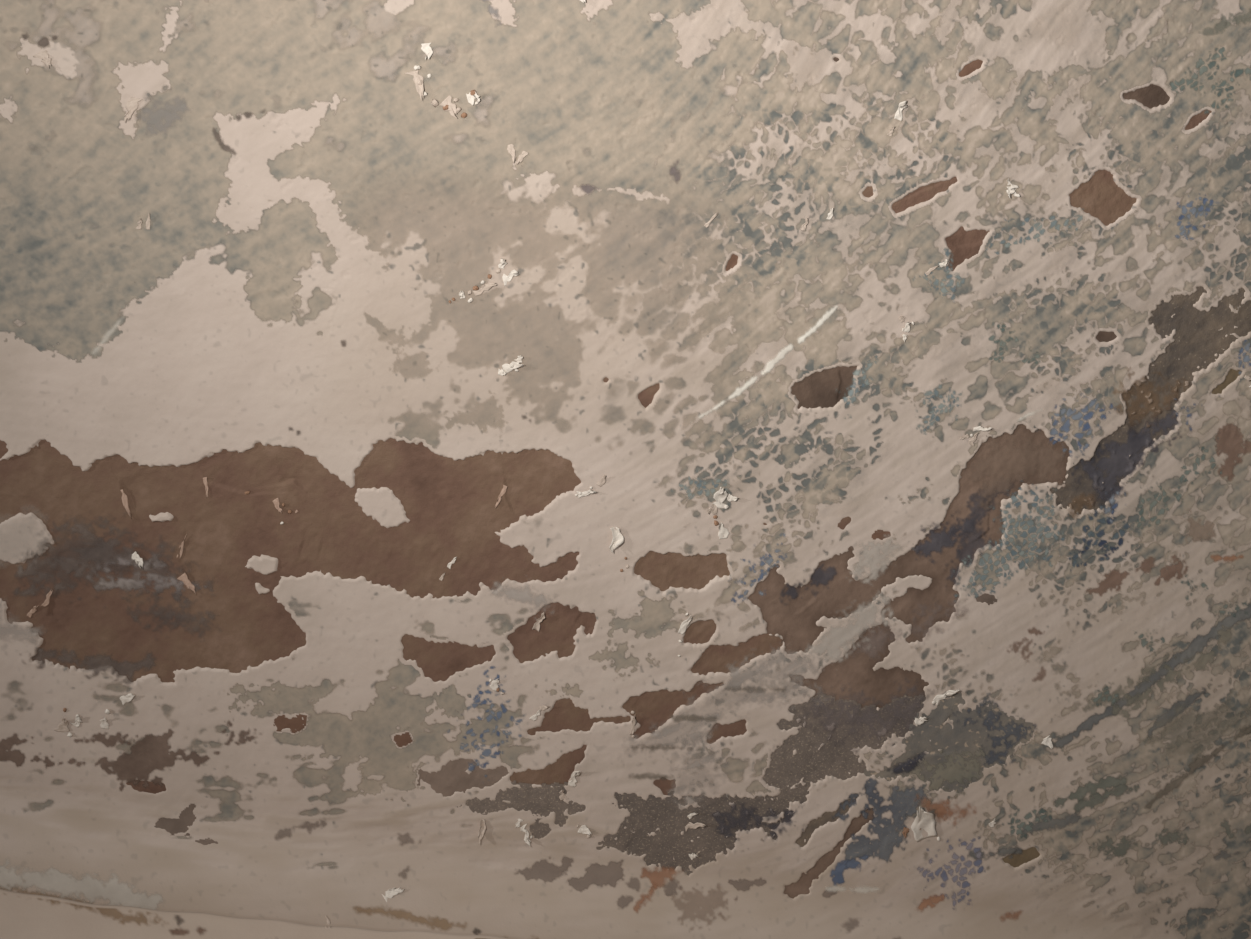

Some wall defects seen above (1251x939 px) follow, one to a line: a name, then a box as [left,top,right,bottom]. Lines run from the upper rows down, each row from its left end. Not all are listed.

flaking render [0,414,606,729]
peeling [227,602,724,847]
peeling [0,0,1251,676]
water stain [699,344,793,418]
peeling [596,621,1060,876]
flaking render [784,794,874,899]
water stain [823,697,1036,897]
water stain [1013,628,1041,656]
water stain [912,390,1179,583]
peeling [975,618,1251,939]
water stain [1087,555,1187,596]
water stain [1215,424,1251,481]